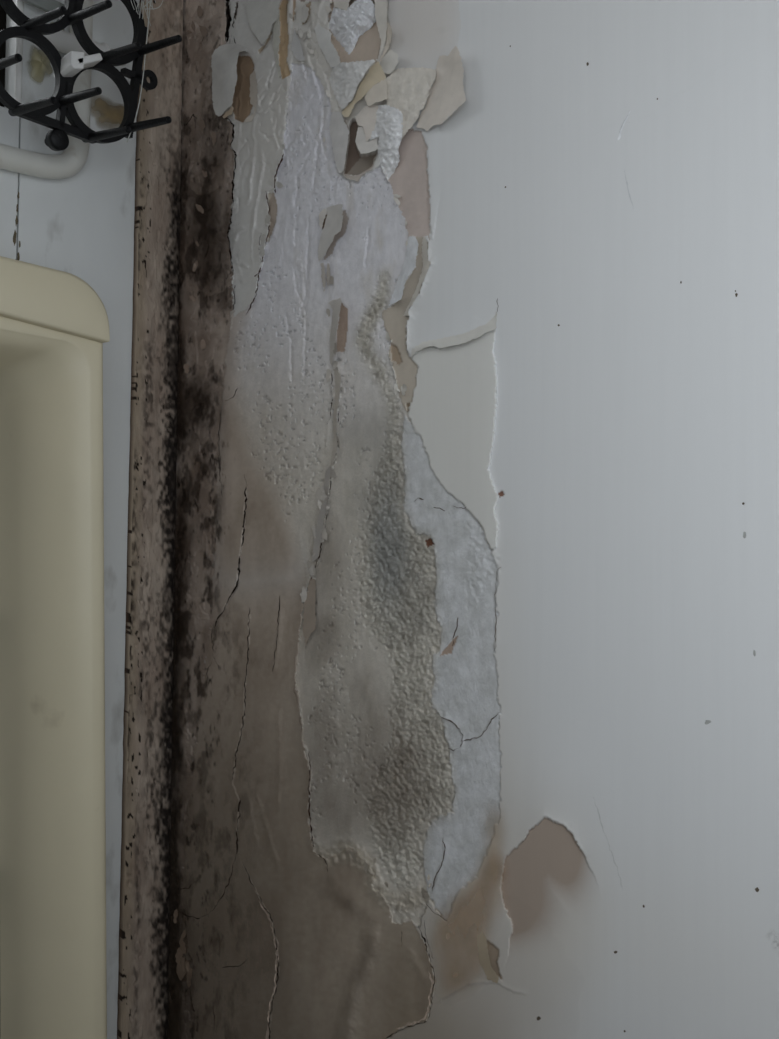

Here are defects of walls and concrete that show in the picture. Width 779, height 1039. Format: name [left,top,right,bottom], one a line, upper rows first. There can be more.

crack [173,389,279,1039]
leakage [151,0,436,1039]
crack [273,597,328,872]
flaking render [211,0,501,927]
peeling [502,820,598,968]